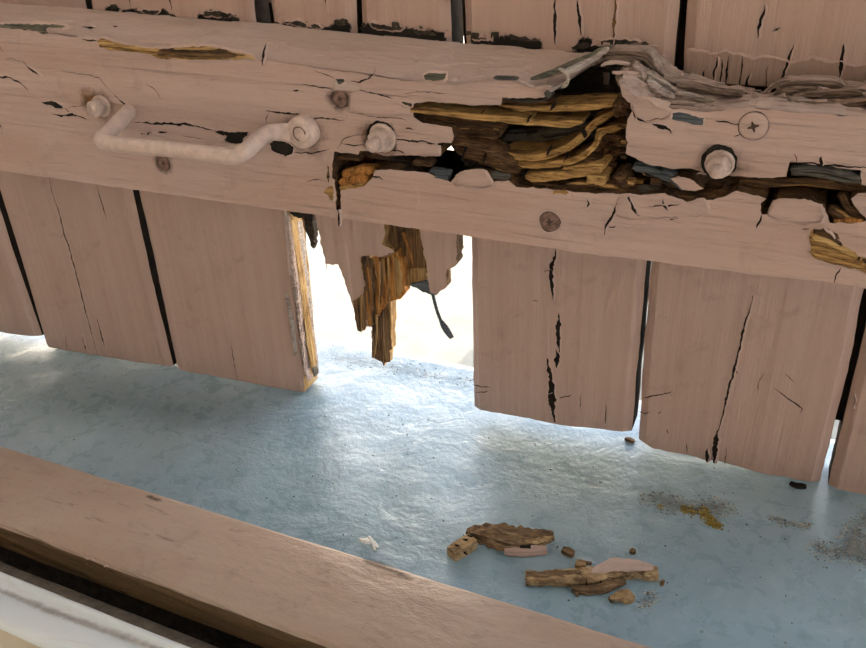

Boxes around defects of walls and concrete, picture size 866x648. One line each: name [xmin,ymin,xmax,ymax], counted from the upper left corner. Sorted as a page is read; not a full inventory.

crack [0,48,44,94]
crack [50,105,89,120]
crack [49,177,107,354]
crack [64,71,217,140]
peeling [284,211,443,383]
peeling [395,140,441,157]
peeling [451,169,495,190]
crack [532,249,581,422]
peeling [615,193,712,221]
peeling [530,44,866,126]
peeling [768,198,866,276]
crack [686,296,756,464]